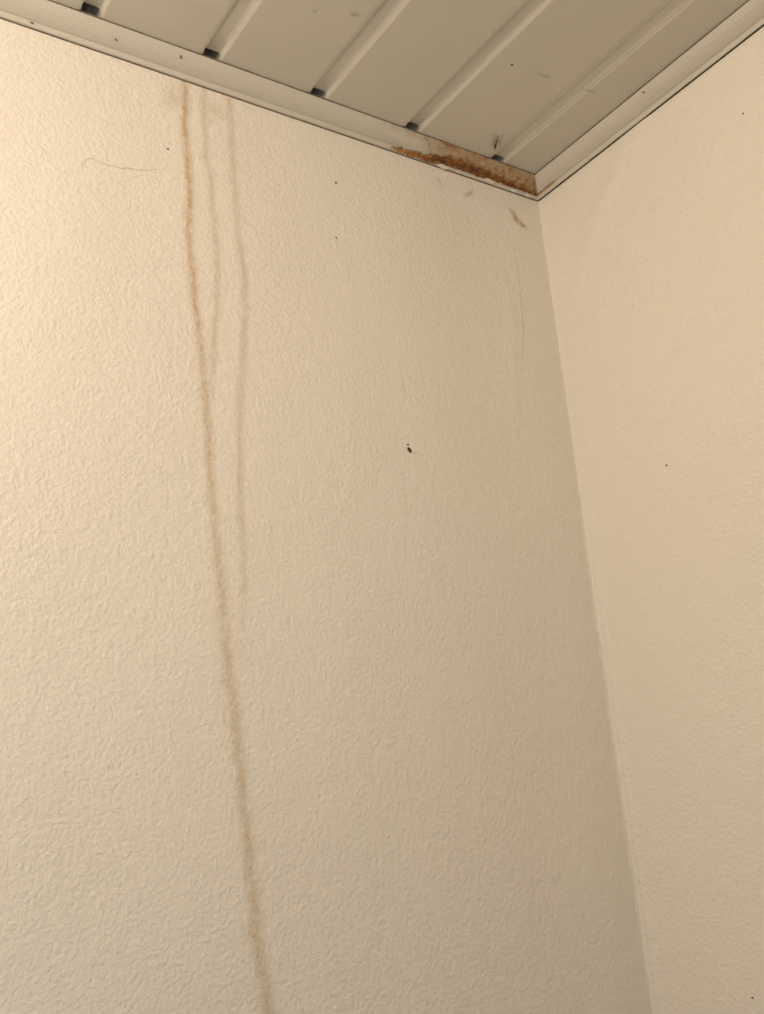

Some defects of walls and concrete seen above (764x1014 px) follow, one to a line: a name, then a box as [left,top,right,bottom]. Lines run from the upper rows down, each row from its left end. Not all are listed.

corrosion [393,137,554,197]